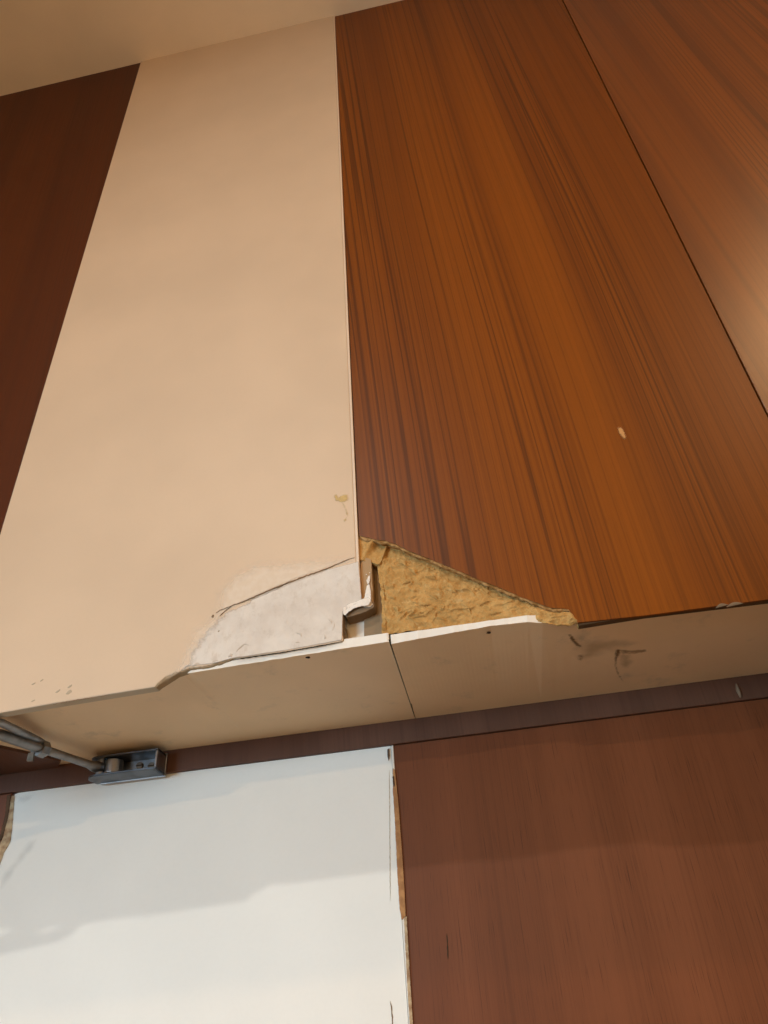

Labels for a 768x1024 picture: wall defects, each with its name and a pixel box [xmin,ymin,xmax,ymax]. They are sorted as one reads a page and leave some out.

flaking render [156,558,412,690]